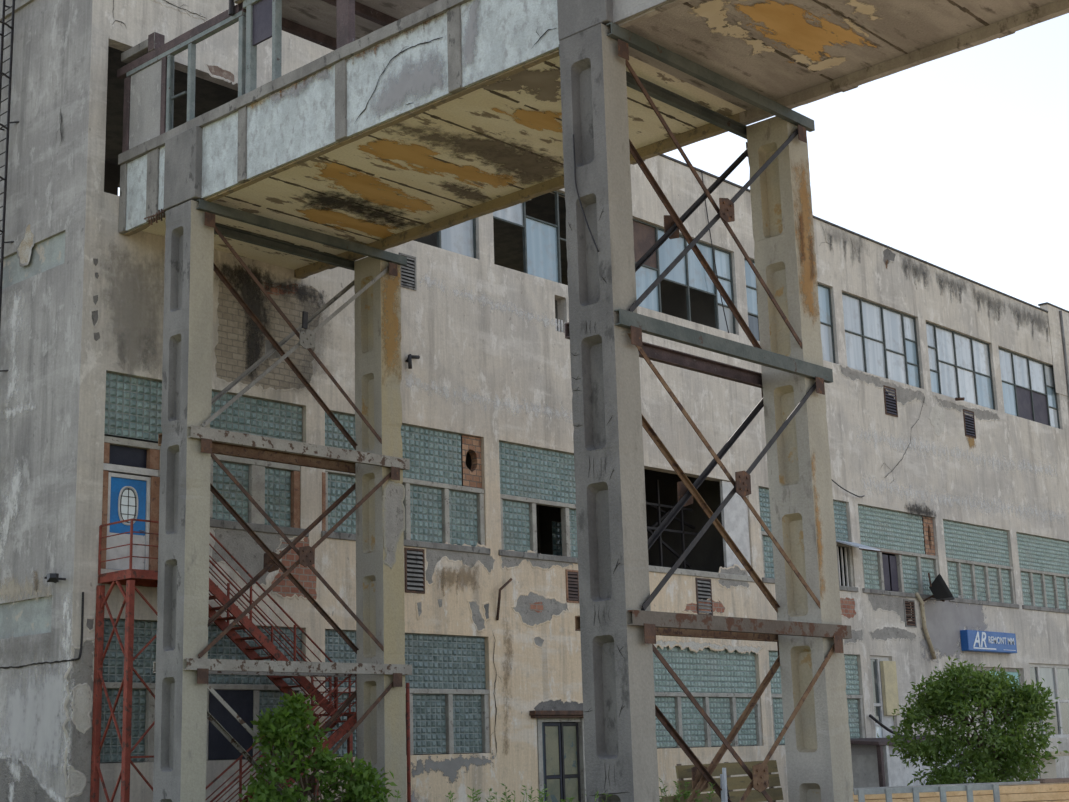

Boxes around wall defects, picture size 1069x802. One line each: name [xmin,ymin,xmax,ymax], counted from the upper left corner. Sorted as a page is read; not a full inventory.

peeling [687,0,882,75]
crack [354,37,443,124]
peeling [483,68,562,133]
peeling [312,160,437,213]
peeling [357,139,521,189]
corrosion [795,166,819,322]
damp [221,264,323,380]
spalling [424,542,574,587]
spalling [467,599,491,633]
spalling [511,590,570,649]
spalling [0,616,96,802]
peeling [411,750,494,783]